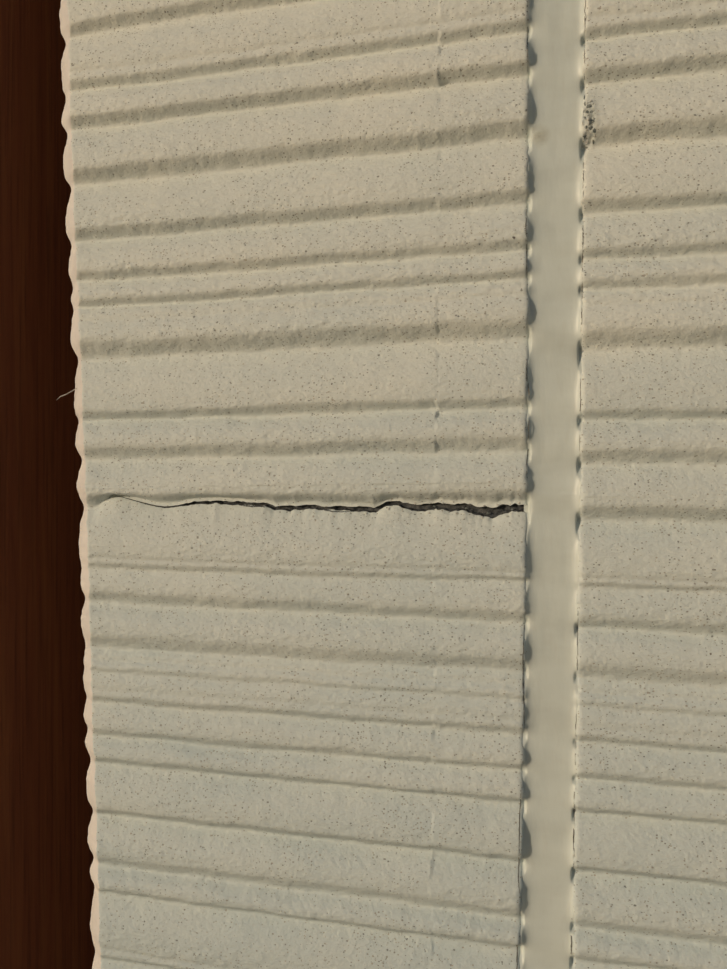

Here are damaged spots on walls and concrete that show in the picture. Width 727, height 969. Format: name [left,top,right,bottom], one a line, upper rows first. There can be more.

crack [114,496,526,519]